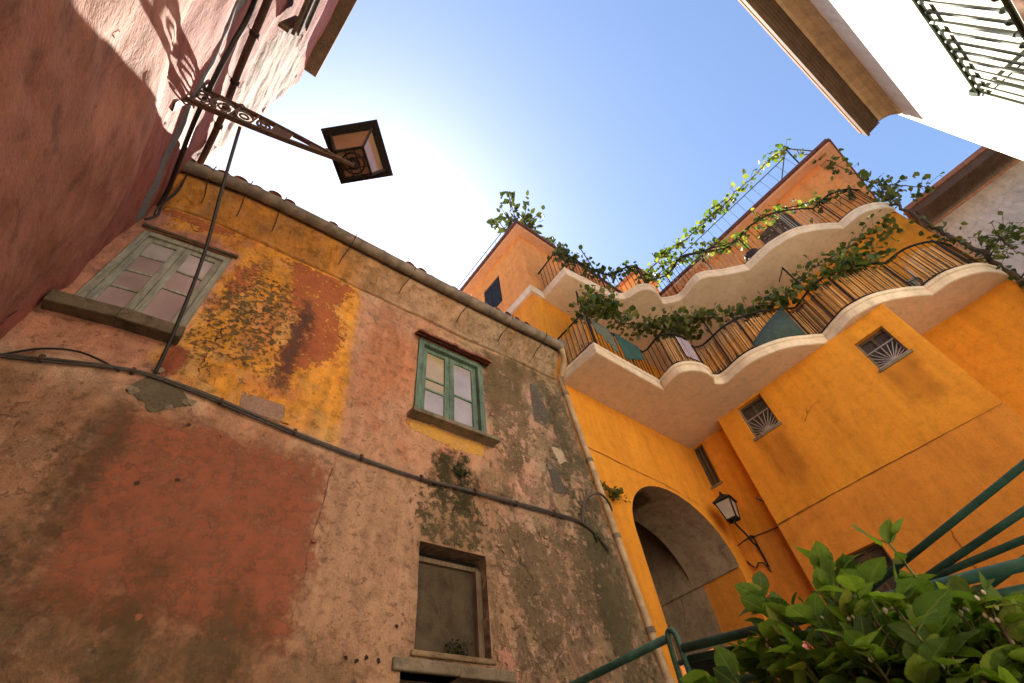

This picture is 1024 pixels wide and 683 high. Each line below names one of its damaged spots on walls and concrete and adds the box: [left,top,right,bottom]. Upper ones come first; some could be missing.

peeling [223,264,263,296]
peeling [271,258,355,376]
flaking render [481,367,569,474]
damp [436,454,471,515]